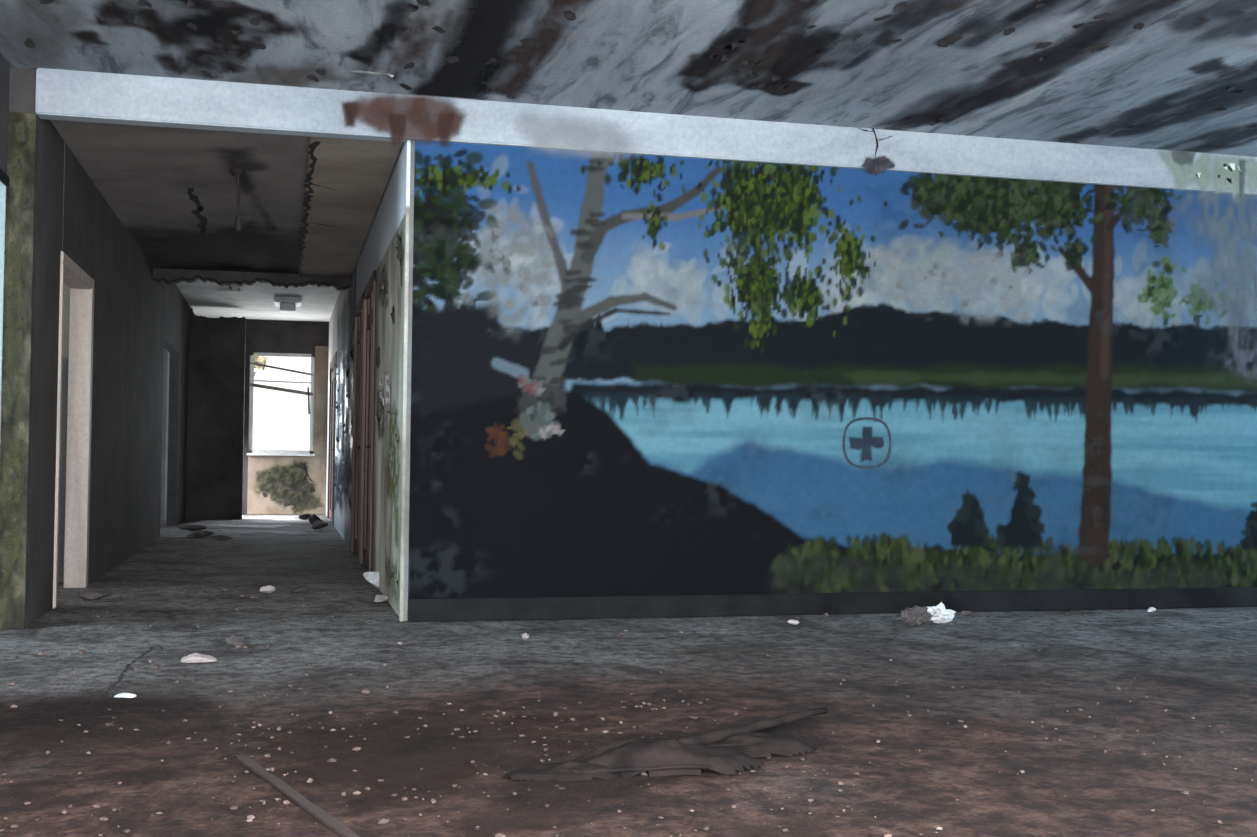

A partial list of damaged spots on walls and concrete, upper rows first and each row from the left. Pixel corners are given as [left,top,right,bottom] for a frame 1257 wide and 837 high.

damp [20,0,336,86]
damp [220,150,265,192]
damp [391,0,457,90]
damp [528,119,626,151]
damp [862,156,895,174]
damp [825,0,968,69]
damp [880,0,1181,130]
damp [1057,58,1257,143]
damp [385,404,400,600]